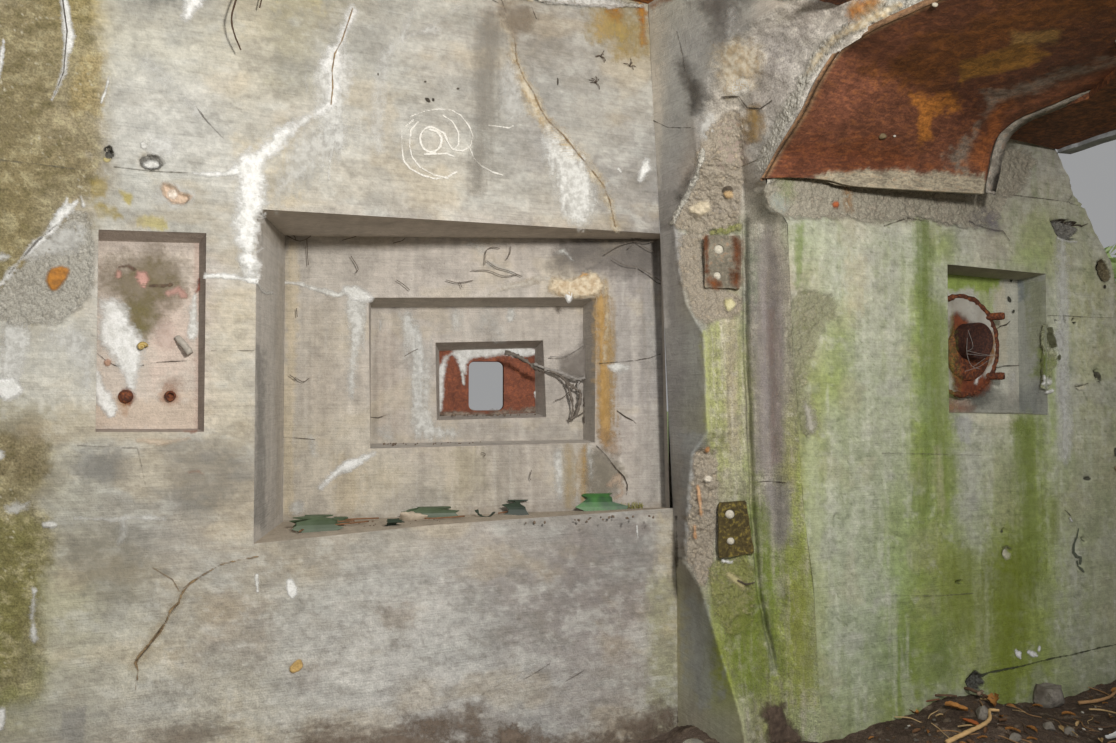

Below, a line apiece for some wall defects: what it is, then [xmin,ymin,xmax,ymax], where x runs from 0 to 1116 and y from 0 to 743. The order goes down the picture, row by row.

crack [515,45,617,230]
spalling [669,0,1037,323]
spalling [0,198,95,326]
rust [704,236,742,288]
spalling [1050,219,1087,242]
water stain [0,321,30,401]
rust [595,280,629,446]
rust [950,313,969,336]
rust [949,338,995,411]
crack [134,556,259,681]
water stain [305,705,479,743]
water stain [623,706,674,737]